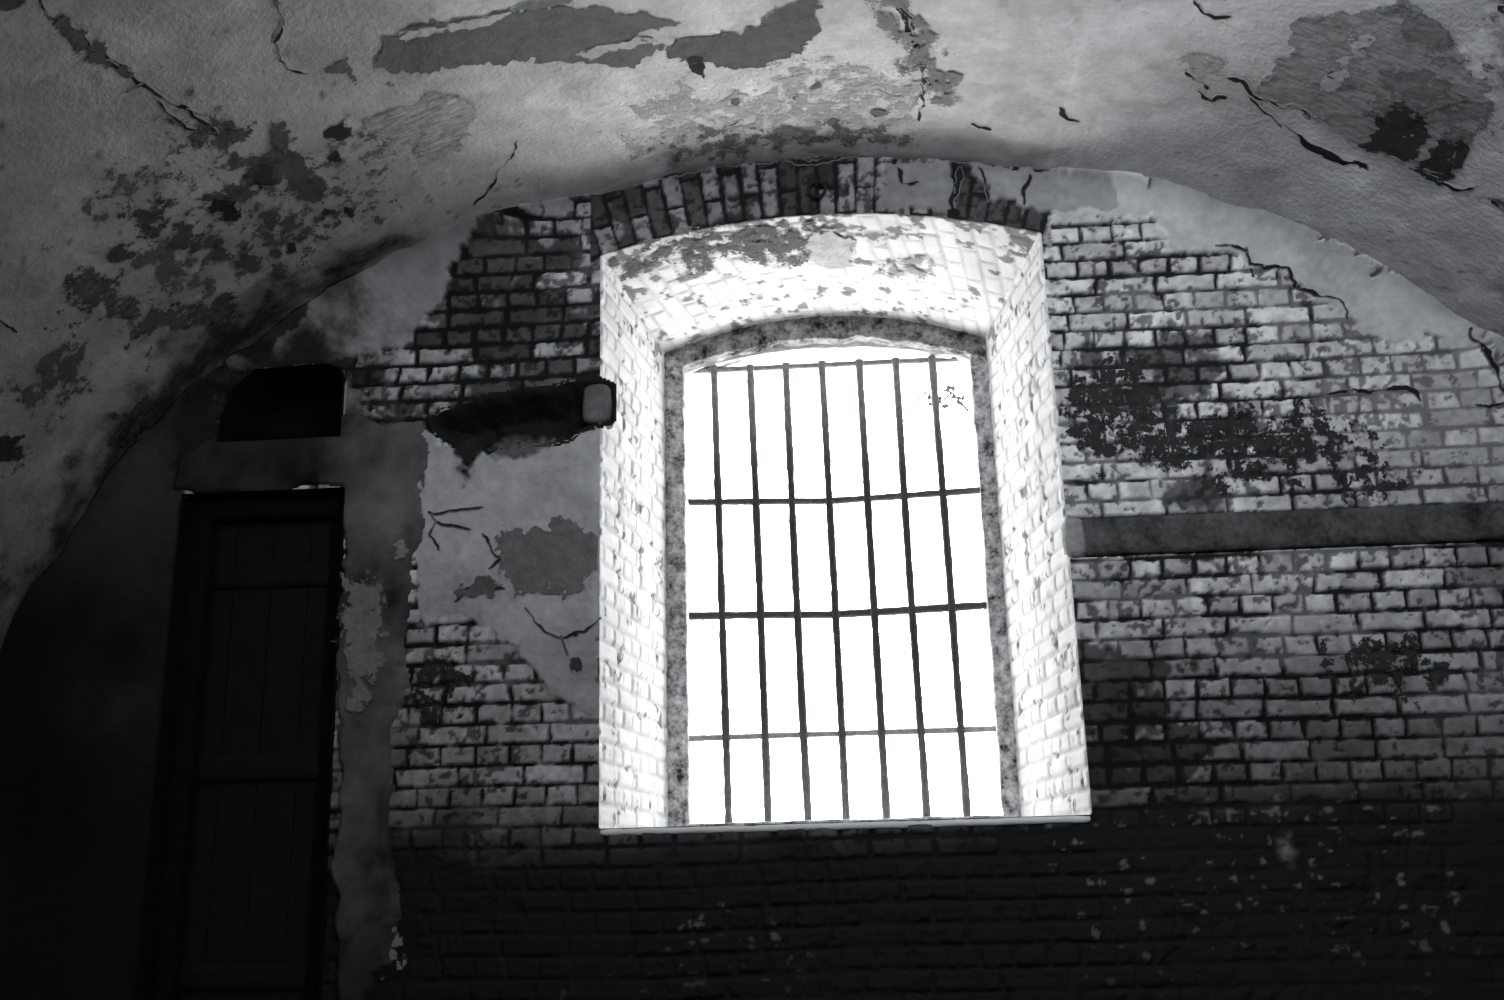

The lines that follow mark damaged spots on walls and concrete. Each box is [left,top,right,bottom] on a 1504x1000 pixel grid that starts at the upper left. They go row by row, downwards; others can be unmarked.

crack [37,0,218,136]
crack [269,0,357,85]
flaking render [374,0,944,170]
crack [865,0,992,131]
spalling [1254,0,1504,213]
crack [897,166,1033,217]
spalling [7,92,476,427]
peeling [605,220,947,290]
crack [1468,327,1504,409]
spalling [0,432,28,479]
spalling [425,375,617,453]
flaking render [453,515,598,603]